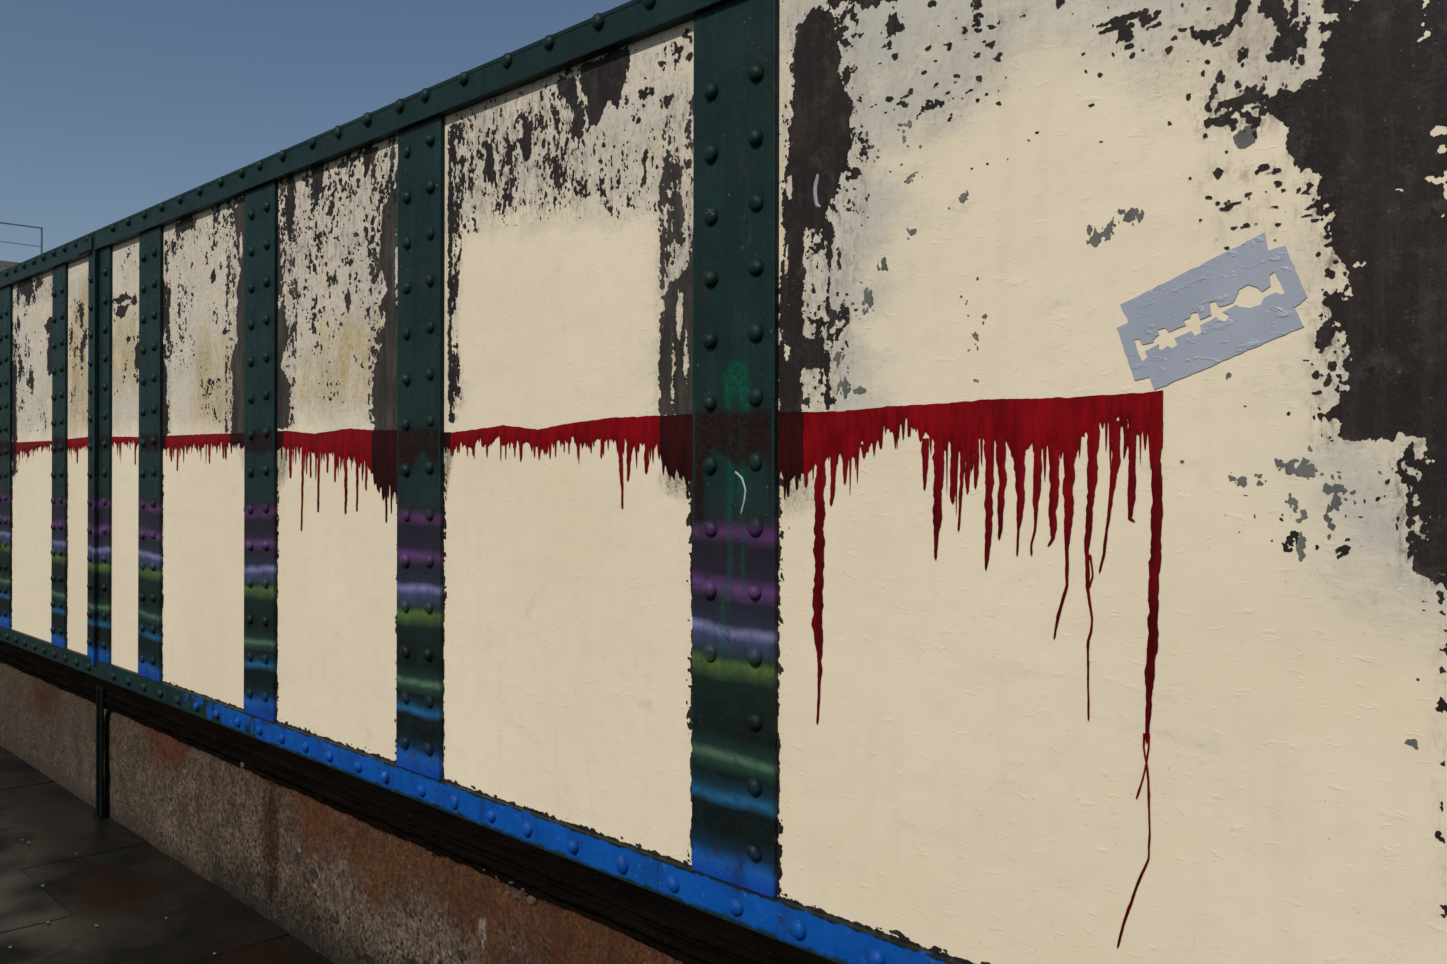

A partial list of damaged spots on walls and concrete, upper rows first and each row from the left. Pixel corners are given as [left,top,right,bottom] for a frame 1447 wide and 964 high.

peeling [657,28,693,71]
peeling [1092,6,1162,59]
peeling [12,275,52,527]
peeling [69,300,88,418]
peeling [163,195,245,436]
peeling [277,136,398,430]
peeling [447,46,694,423]
peeling [778,0,1006,413]
peeling [1086,207,1144,247]
peeling [1165,0,1447,673]
peeling [1435,697,1447,713]